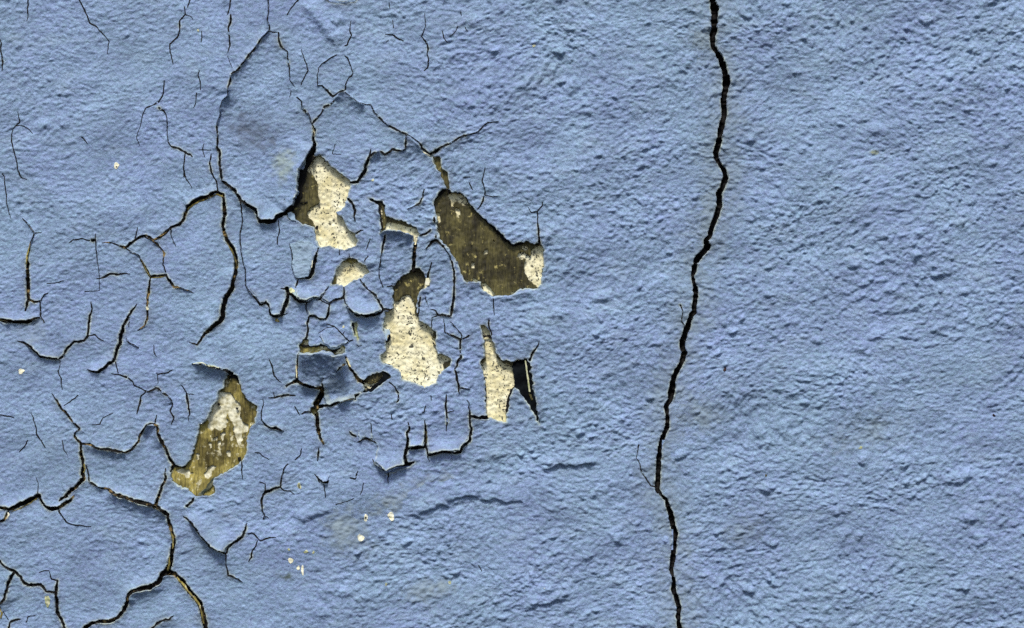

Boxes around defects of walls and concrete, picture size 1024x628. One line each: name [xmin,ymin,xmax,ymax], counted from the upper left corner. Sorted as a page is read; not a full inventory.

peeling [287,155,369,286]
peeling [433,157,544,296]
crack [528,202,543,244]
peeling [170,374,257,496]
crack [0,0,499,628]
peeling [355,268,451,400]
peeling [480,325,539,422]
crack [636,0,732,628]